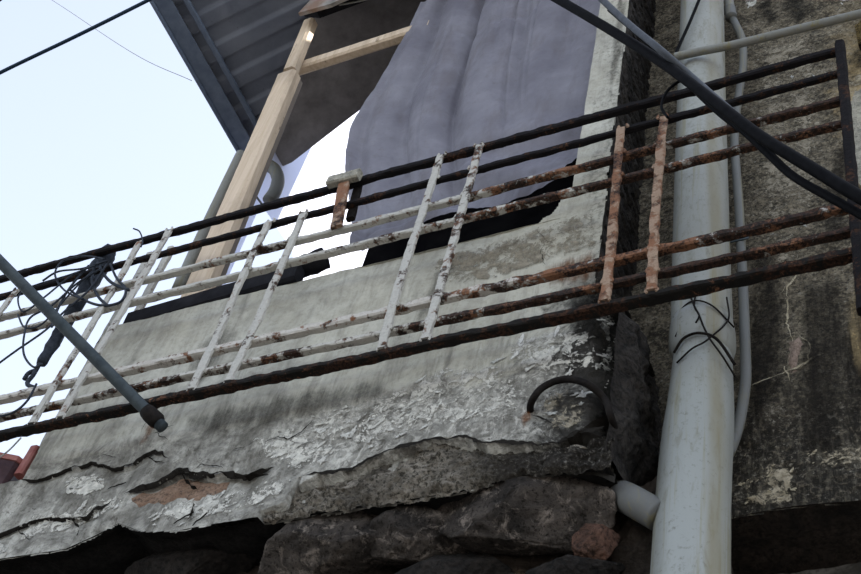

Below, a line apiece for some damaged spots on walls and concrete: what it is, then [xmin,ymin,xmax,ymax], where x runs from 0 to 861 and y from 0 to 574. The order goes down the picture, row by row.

peeling [849,74,861,185]
crack [0,421,312,539]
spalling [20,315,615,540]
leakage [751,280,781,414]
leakage [804,281,861,446]